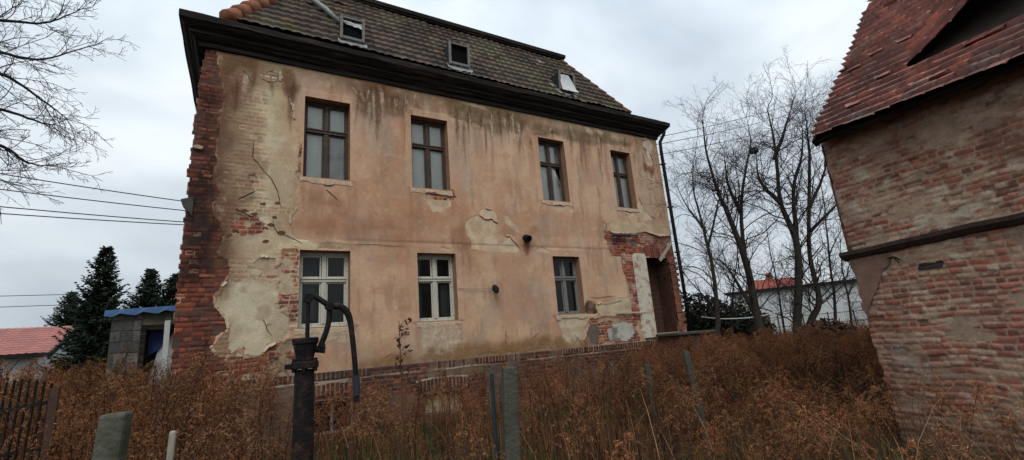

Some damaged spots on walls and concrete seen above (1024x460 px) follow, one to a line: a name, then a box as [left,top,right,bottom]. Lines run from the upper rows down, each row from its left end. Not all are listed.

peeling [170,49,350,387]
crack [252,143,303,244]
peeling [425,189,456,212]
peeling [465,207,520,252]
flaking render [559,198,685,347]
peeling [849,253,892,314]